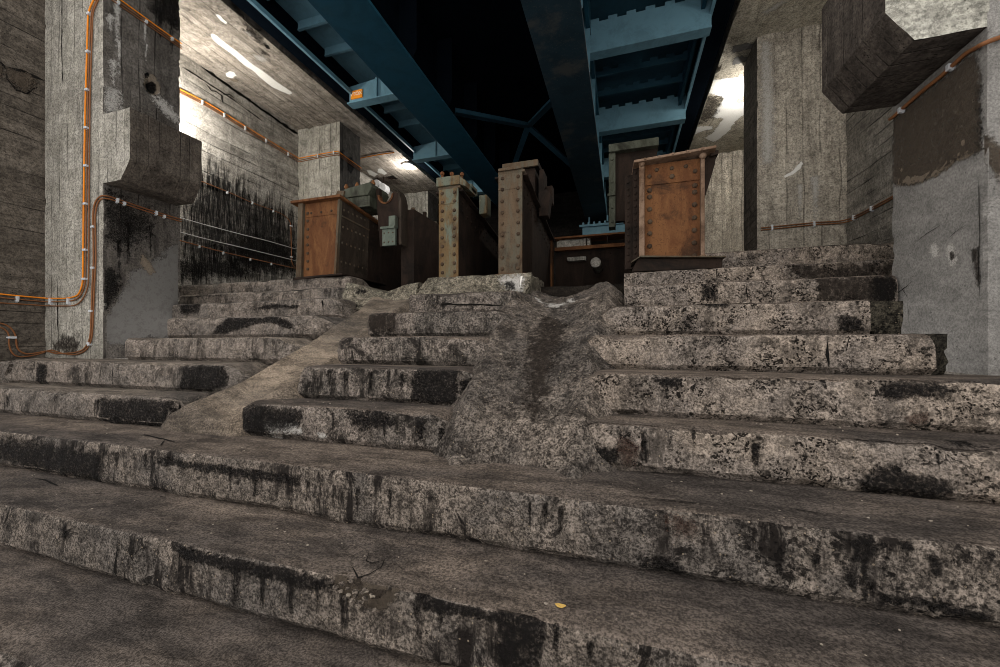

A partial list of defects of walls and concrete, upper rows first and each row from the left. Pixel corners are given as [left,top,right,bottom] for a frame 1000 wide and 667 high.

spalling [892,52,1000,186]
water stain [104,185,157,311]
water stain [179,160,297,314]
water stain [0,436,119,483]
water stain [144,454,310,501]
water stain [178,547,349,639]
crack [350,552,401,579]
water stain [413,592,560,667]